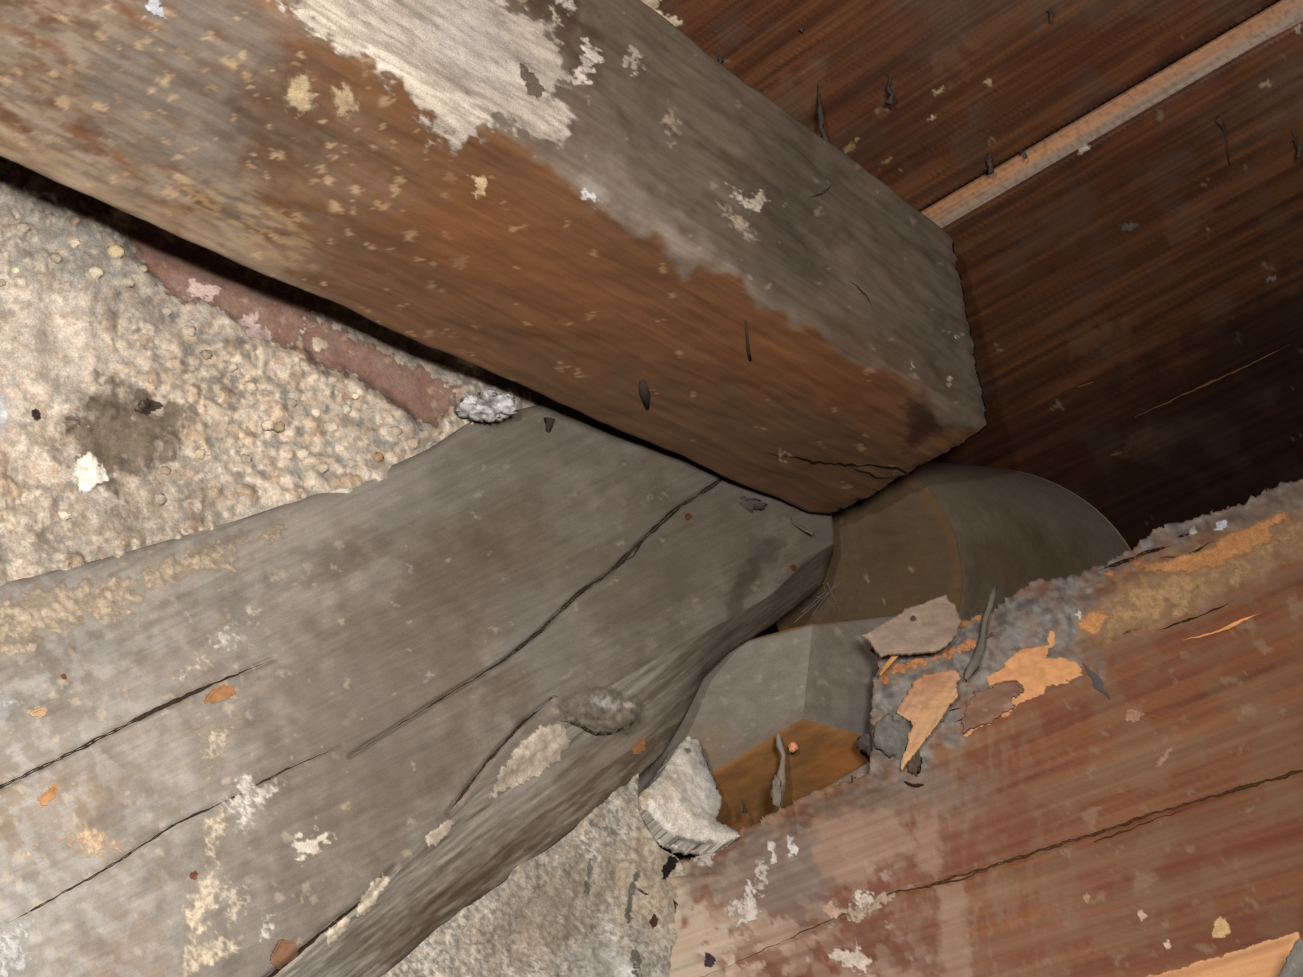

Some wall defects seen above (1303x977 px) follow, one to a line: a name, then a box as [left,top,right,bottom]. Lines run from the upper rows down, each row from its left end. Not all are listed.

peeling [961,681,1024,734]
crack [886,770,1303,896]
crack [638,888,678,912]
crack [701,909,856,977]
peeling [1146,932,1303,977]